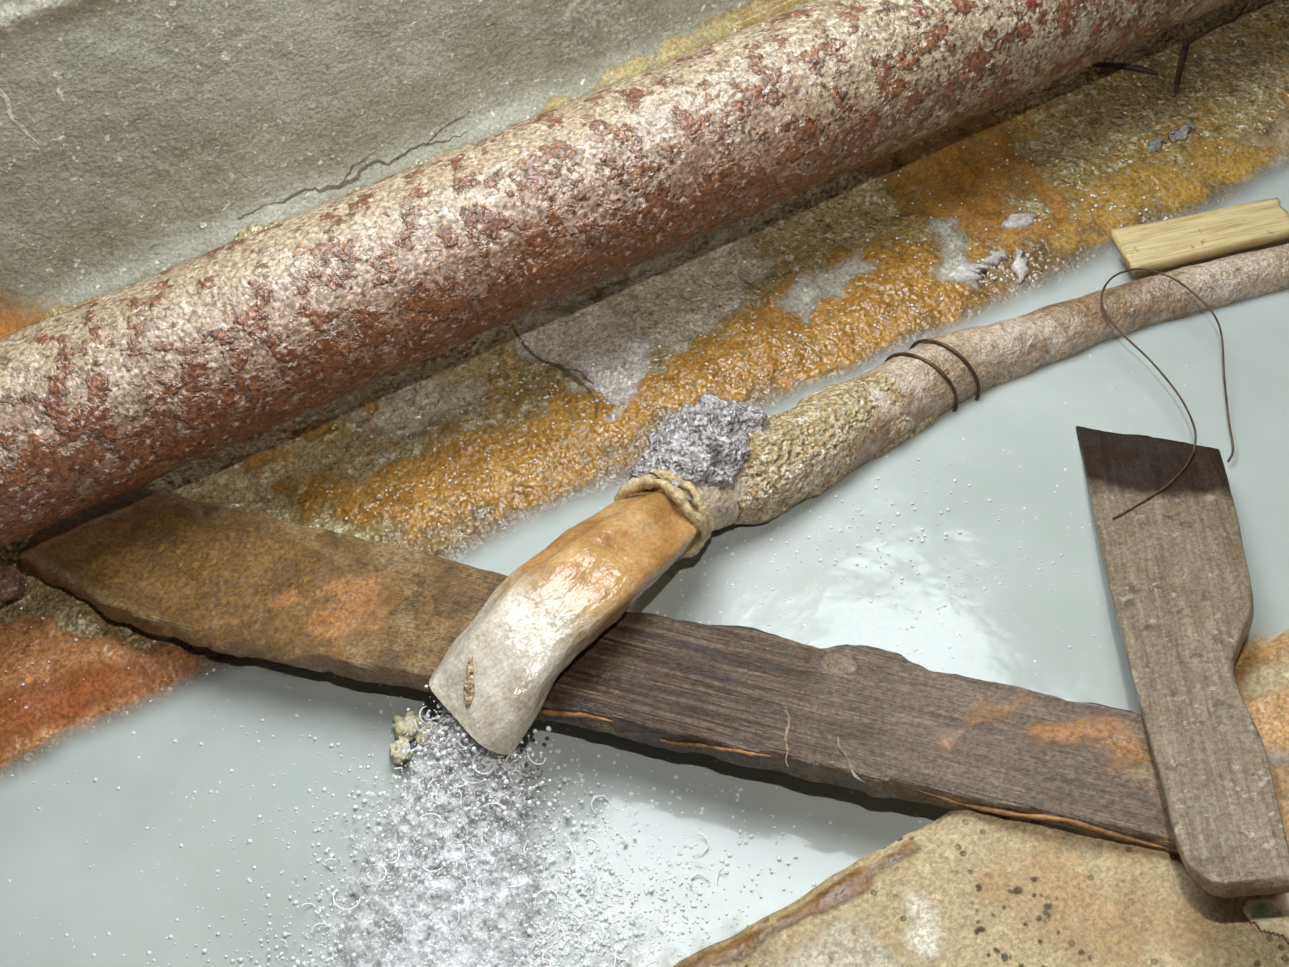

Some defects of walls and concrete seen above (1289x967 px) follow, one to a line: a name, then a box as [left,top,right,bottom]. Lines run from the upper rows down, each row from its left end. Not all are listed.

crack [237,111,471,219]
rust [0,307,32,338]
water stain [515,295,650,415]
water stain [779,251,875,323]
water stain [932,219,976,287]
rust [0,616,195,769]